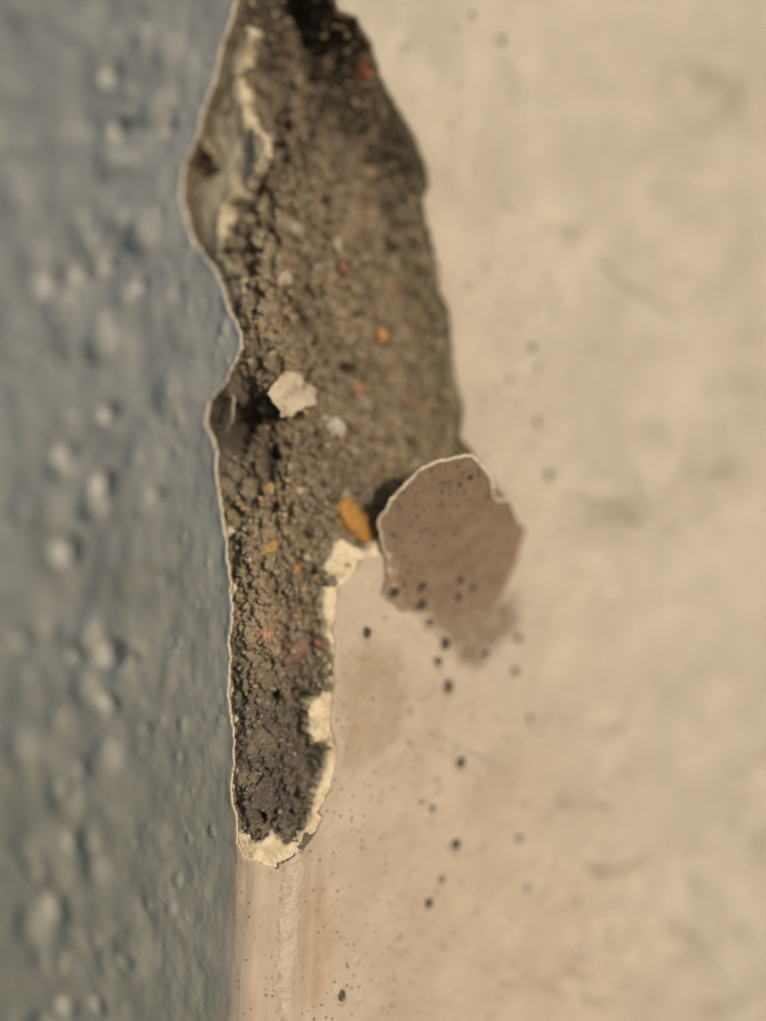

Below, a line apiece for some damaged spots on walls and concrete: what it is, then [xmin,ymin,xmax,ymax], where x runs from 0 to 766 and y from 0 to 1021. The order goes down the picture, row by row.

spalling [193,0,527,868]